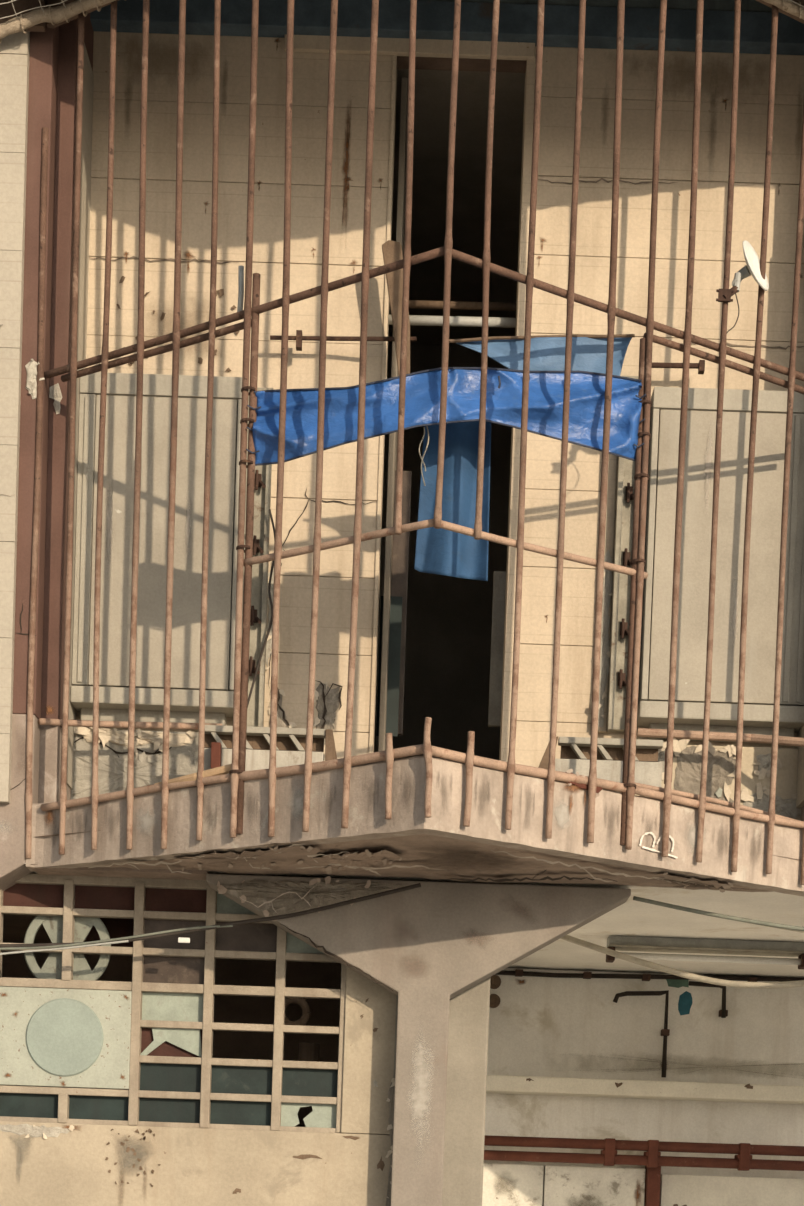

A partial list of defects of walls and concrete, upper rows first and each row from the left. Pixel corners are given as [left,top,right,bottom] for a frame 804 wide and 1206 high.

corrosion [343,117,352,218]
peeling [269,689,297,728]
peeling [313,682,341,745]
flaking render [71,727,197,798]
flaking render [658,738,801,819]
spalling [216,854,402,921]